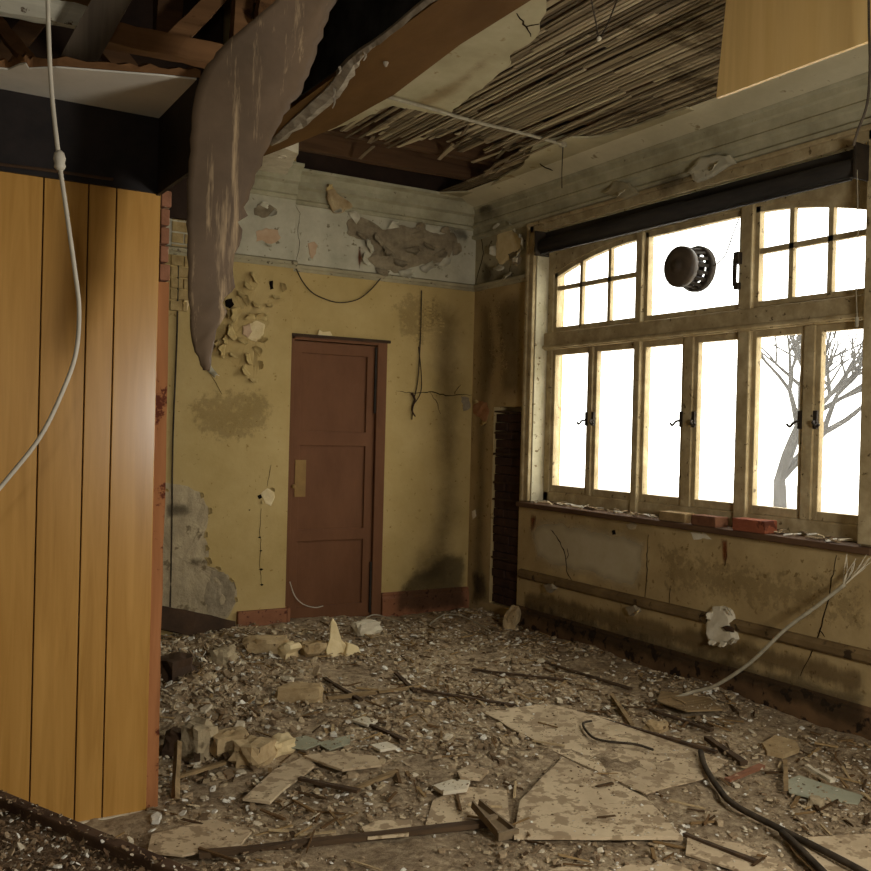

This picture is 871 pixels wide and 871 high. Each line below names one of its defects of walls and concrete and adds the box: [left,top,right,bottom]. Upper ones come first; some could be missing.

peeling [687,155,737,183]
peeling [254,201,281,247]
spalling [326,184,462,279]
peeling [489,221,524,280]
peeling [213,270,287,384]
spalling [162,483,239,619]
spalling [706,606,739,648]
crack [800,555,837,676]